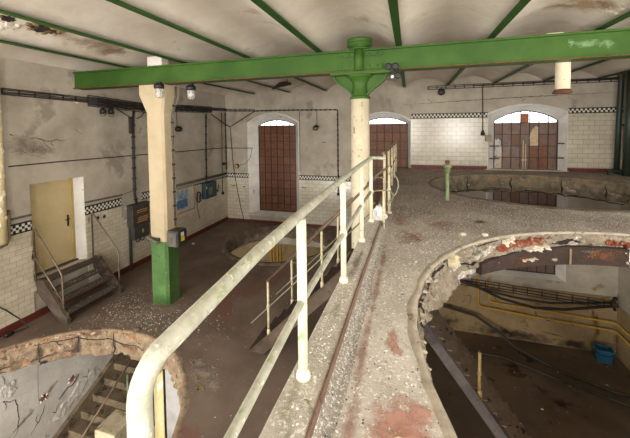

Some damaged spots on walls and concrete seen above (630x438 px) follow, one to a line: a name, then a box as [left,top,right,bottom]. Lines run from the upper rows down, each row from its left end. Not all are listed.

flaking render [0,15,65,36]
crack [450,178,624,205]
spalling [447,253,462,269]
spalling [476,236,630,275]
flaking render [41,331,131,343]
crack [3,334,144,437]